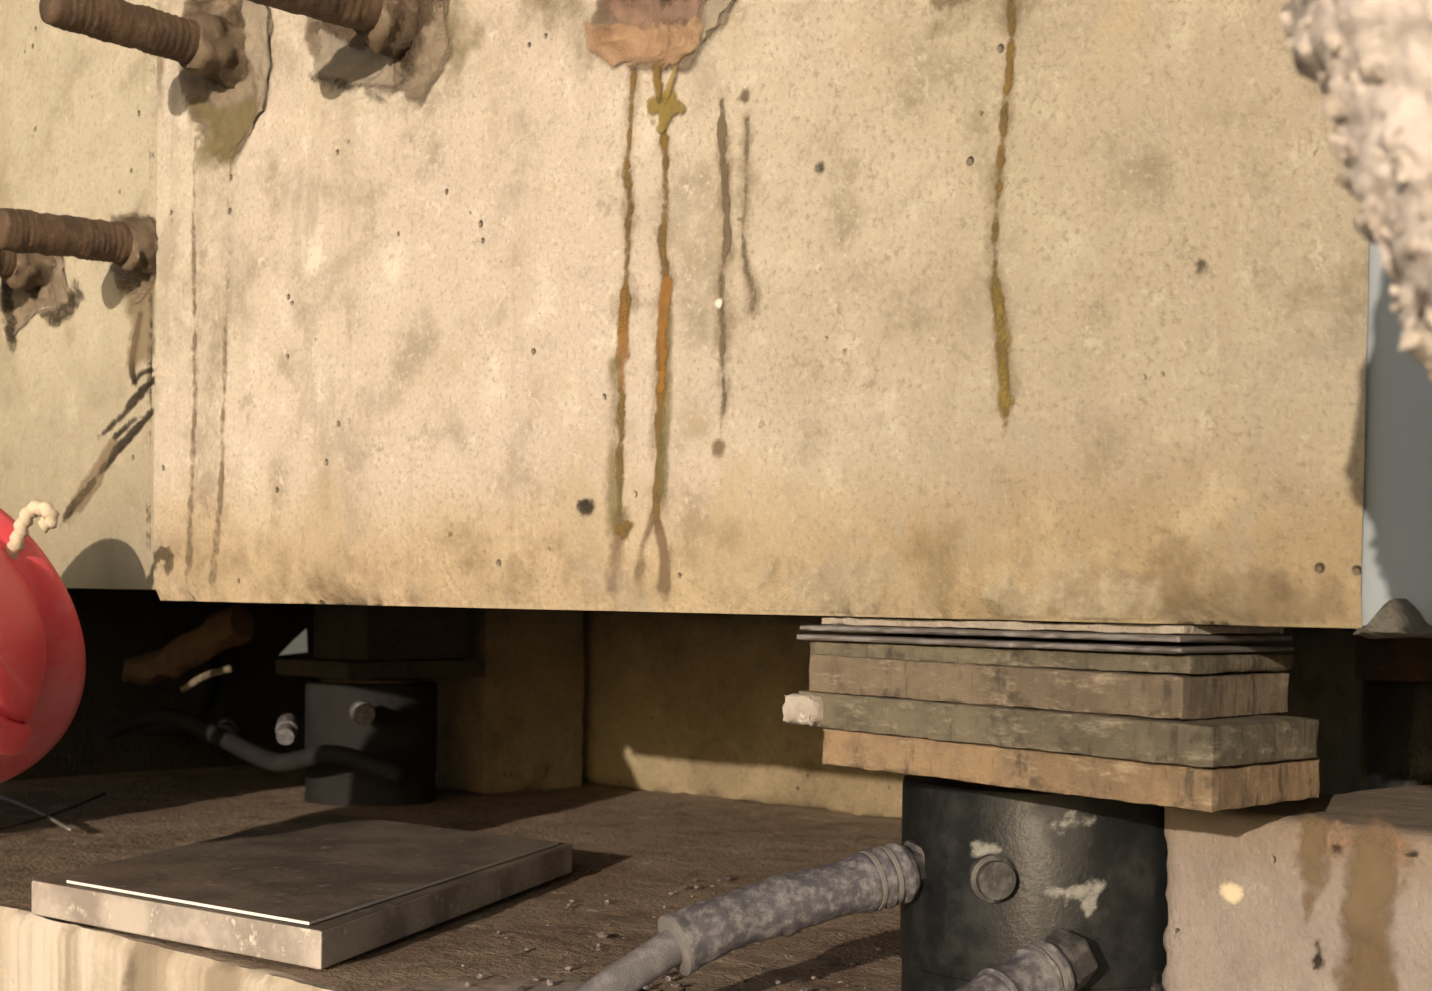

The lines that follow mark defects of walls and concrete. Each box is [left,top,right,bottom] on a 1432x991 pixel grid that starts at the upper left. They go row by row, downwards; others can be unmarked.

spalling [179,0,272,162]
spalling [304,0,463,105]
spalling [583,0,737,72]
corrosion [995,0,1016,199]
corrosion [991,219,999,242]
crack [62,296,155,522]
corrosion [608,54,687,594]
corrosion [991,260,1014,426]
damp [1300,817,1411,991]